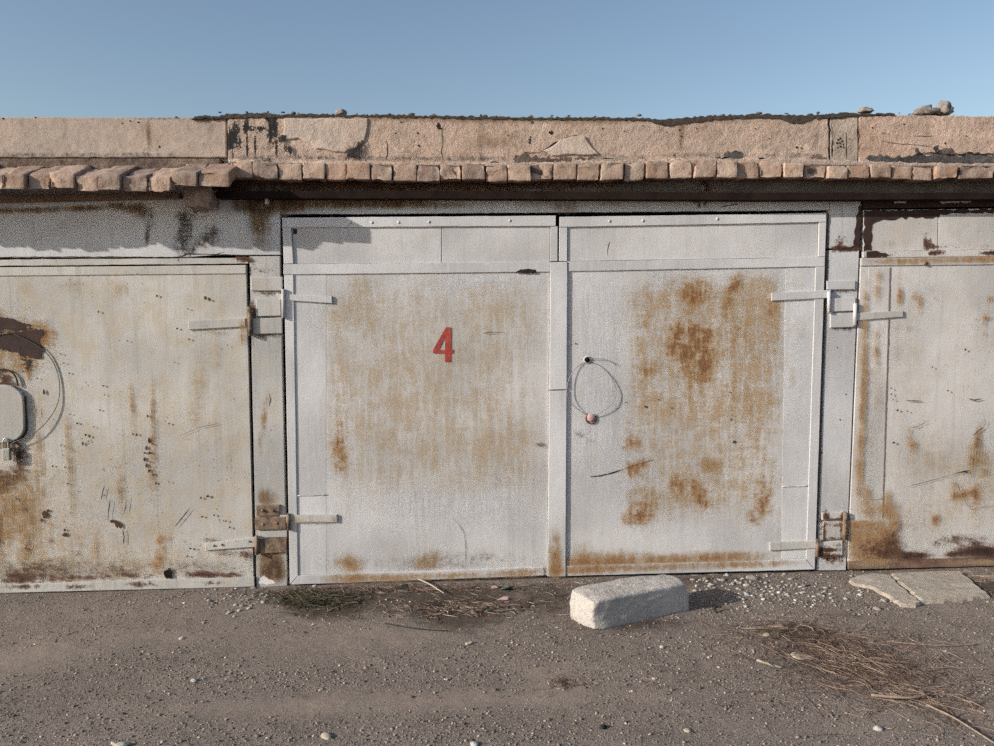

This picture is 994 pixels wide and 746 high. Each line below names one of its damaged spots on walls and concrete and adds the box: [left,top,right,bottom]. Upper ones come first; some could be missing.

water stain [175,210,218,256]
peeling [852,201,994,258]
rust [0,315,55,388]
rust [622,275,780,525]
rust [819,236,994,566]
rust [333,422,347,471]
rust [0,433,169,590]
rust [186,570,240,584]
rust [206,538,285,582]
rust [331,553,536,583]
rust [549,535,784,578]